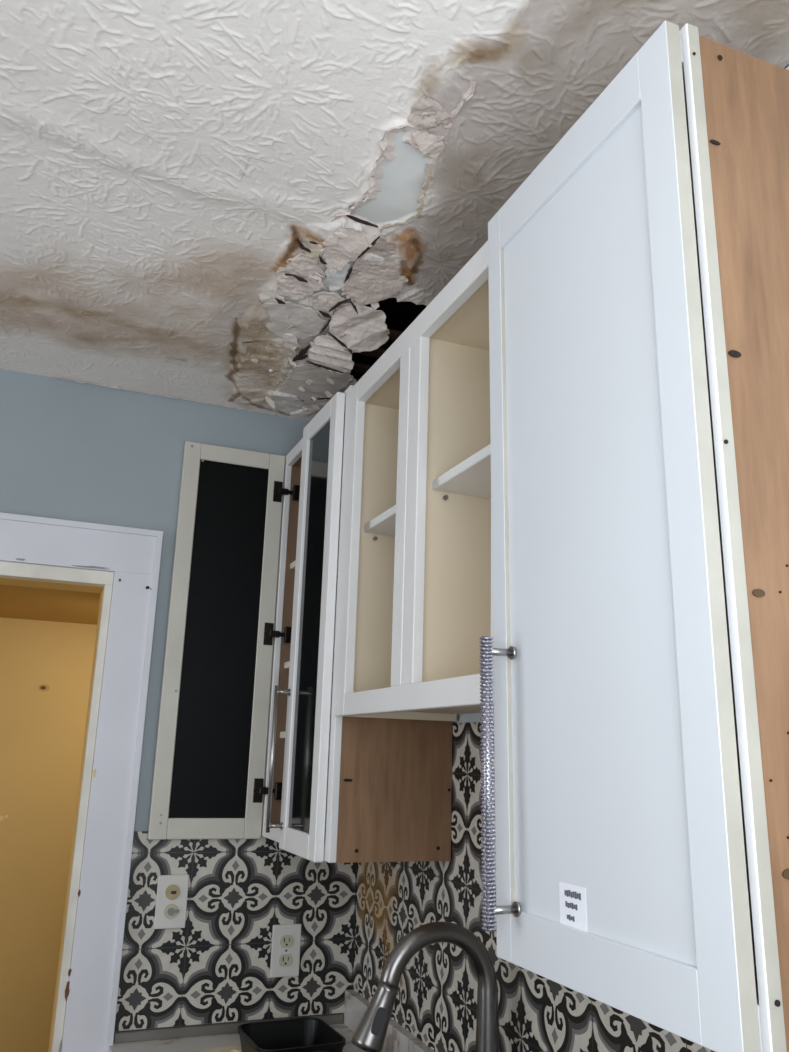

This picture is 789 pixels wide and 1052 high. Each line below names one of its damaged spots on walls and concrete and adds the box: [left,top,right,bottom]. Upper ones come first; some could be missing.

crack [275,215,380,374]
spalling [251,81,476,414]